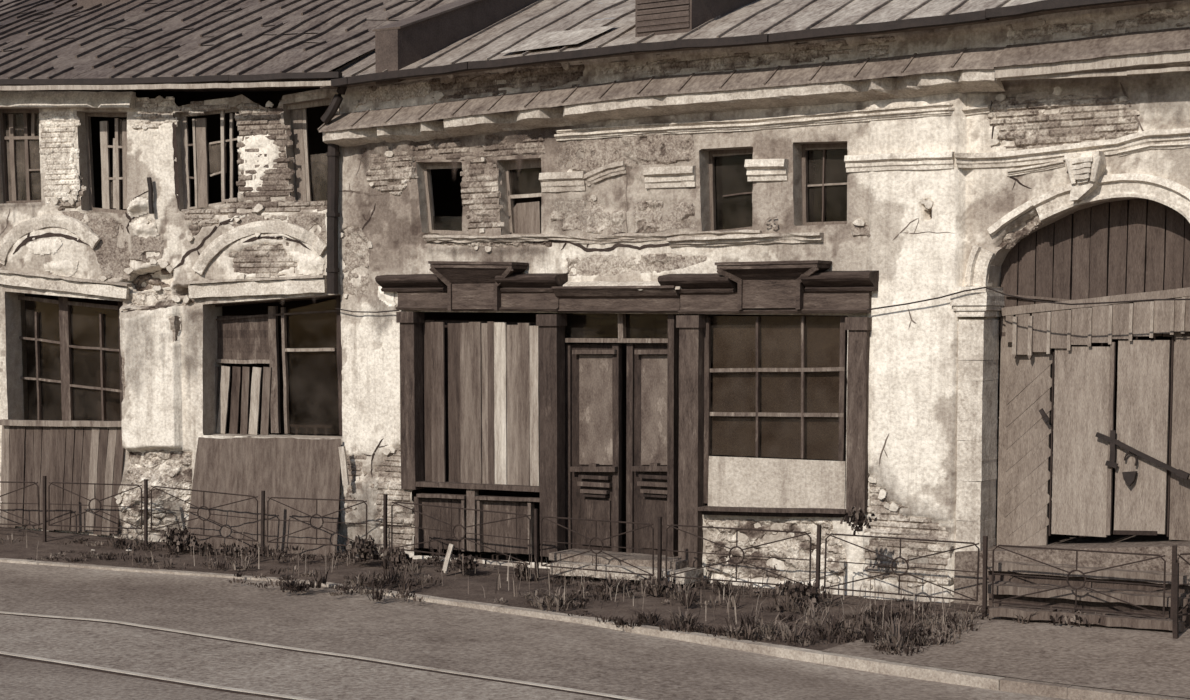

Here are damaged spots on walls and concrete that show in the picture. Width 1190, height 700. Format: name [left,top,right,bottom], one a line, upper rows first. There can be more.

spalling [987,86,1140,151]
spalling [39,108,174,281]
crack [125,113,180,233]
spalling [132,95,373,298]
spalling [366,133,697,252]
crack [0,210,88,262]
crack [173,215,310,273]
spalling [562,253,707,276]
spalling [122,285,195,342]
flaking render [704,517,847,584]
spalling [863,474,955,589]